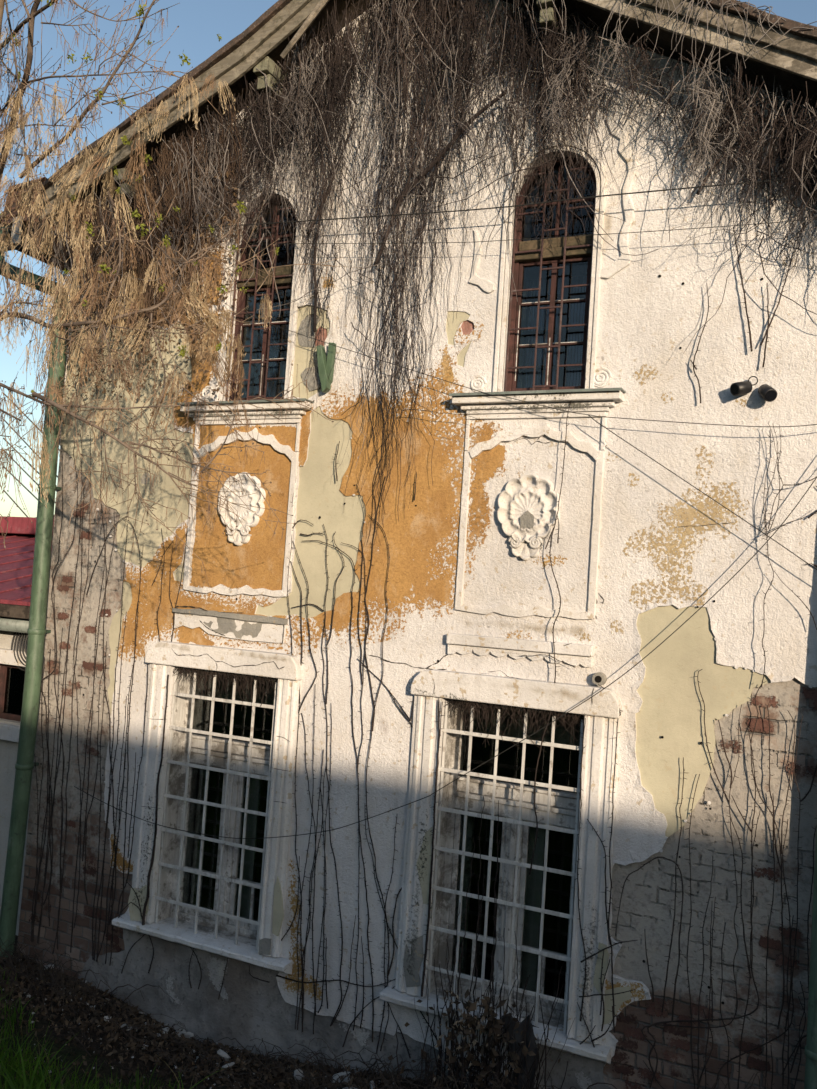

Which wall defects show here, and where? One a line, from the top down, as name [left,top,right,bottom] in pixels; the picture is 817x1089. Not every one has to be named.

spalling [16,213,507,1084]
peeling [515,298,584,385]
spalling [533,446,817,1089]